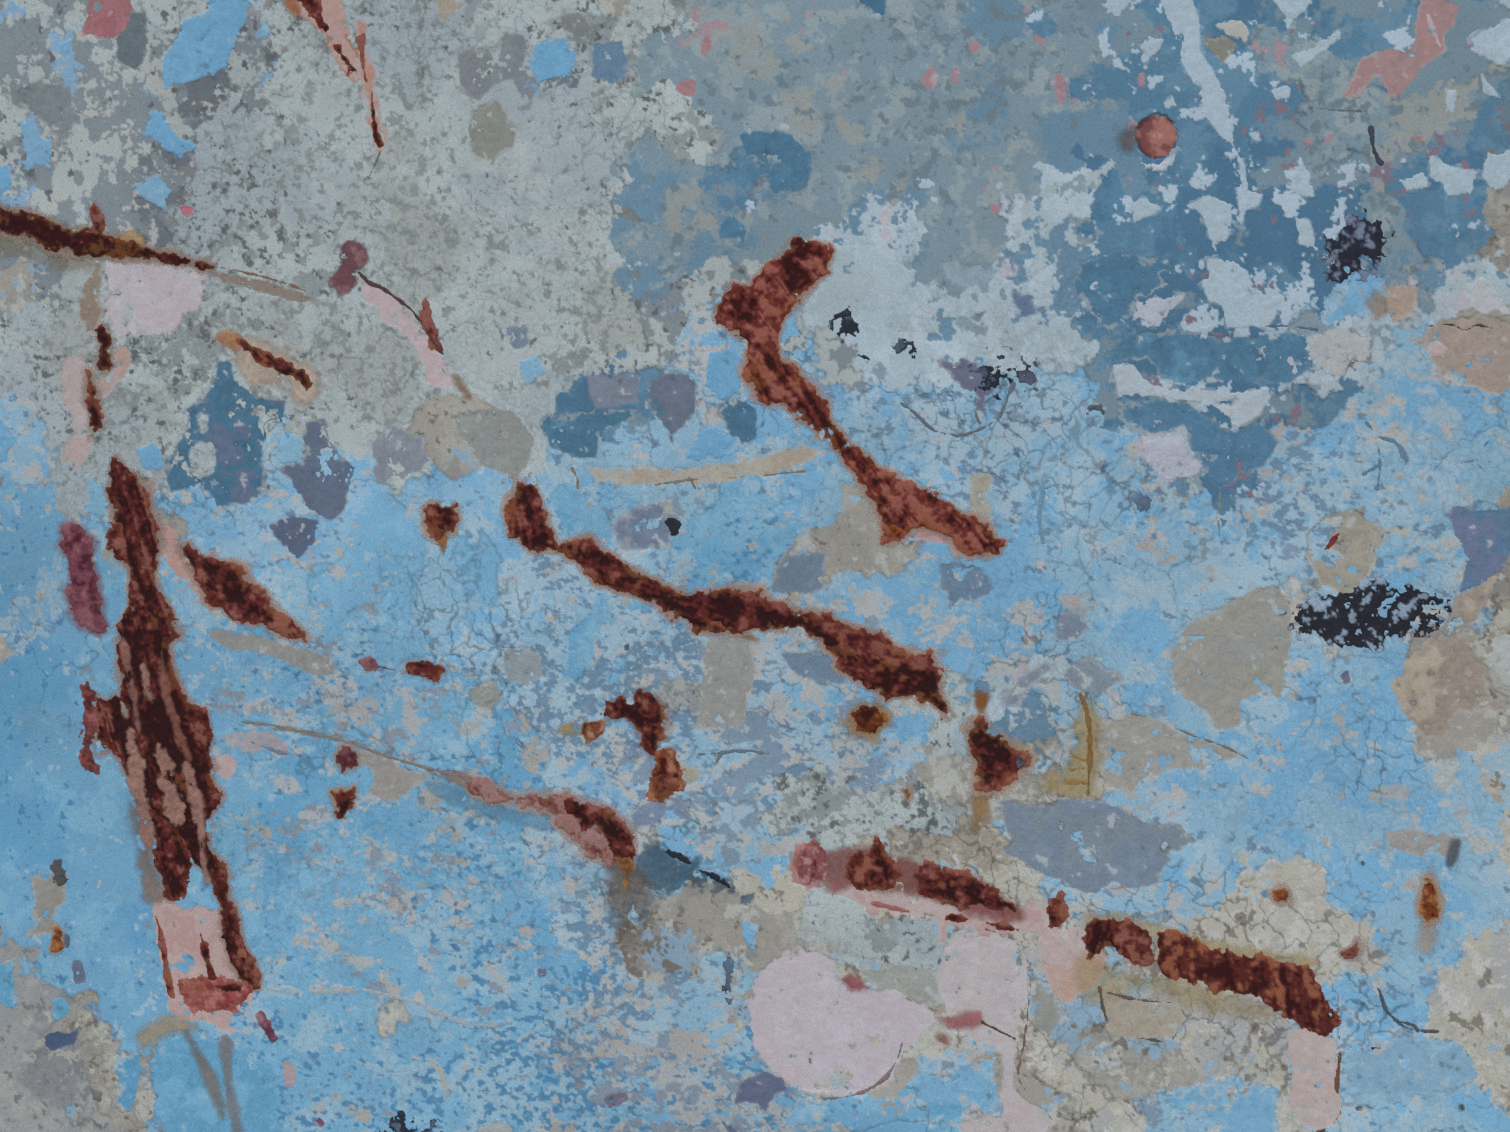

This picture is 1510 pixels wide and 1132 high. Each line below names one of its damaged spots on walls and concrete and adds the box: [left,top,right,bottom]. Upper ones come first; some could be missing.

peeling [79,0,149,74]
peeling [1344,0,1510,99]
corrosion [0,203,306,292]
corrosion [713,236,1007,560]
peeling [1070,194,1510,488]
peeling [1399,133,1510,201]
corrosion [58,455,310,1044]
corrosion [428,768,638,891]
corrosion [501,477,1035,828]
peeling [1388,503,1510,738]
corrosion [787,835,1342,1037]
peeling [112,1025,296,1132]